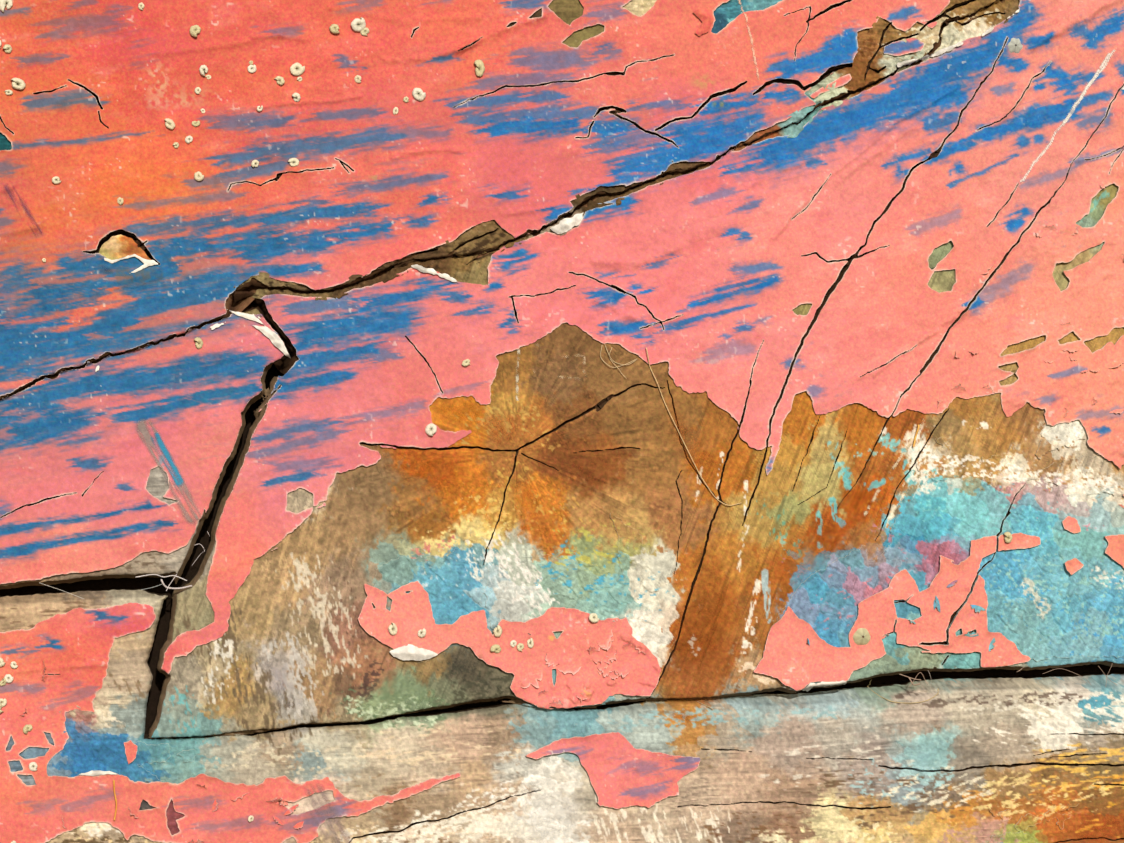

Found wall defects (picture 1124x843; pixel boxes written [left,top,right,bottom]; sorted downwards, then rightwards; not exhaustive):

peeling [0,132,12,150]
crack [0,0,1046,697]
crack [792,84,1124,508]
peeling [0,322,1124,843]
crack [677,801,889,810]
crack [806,733,1124,786]